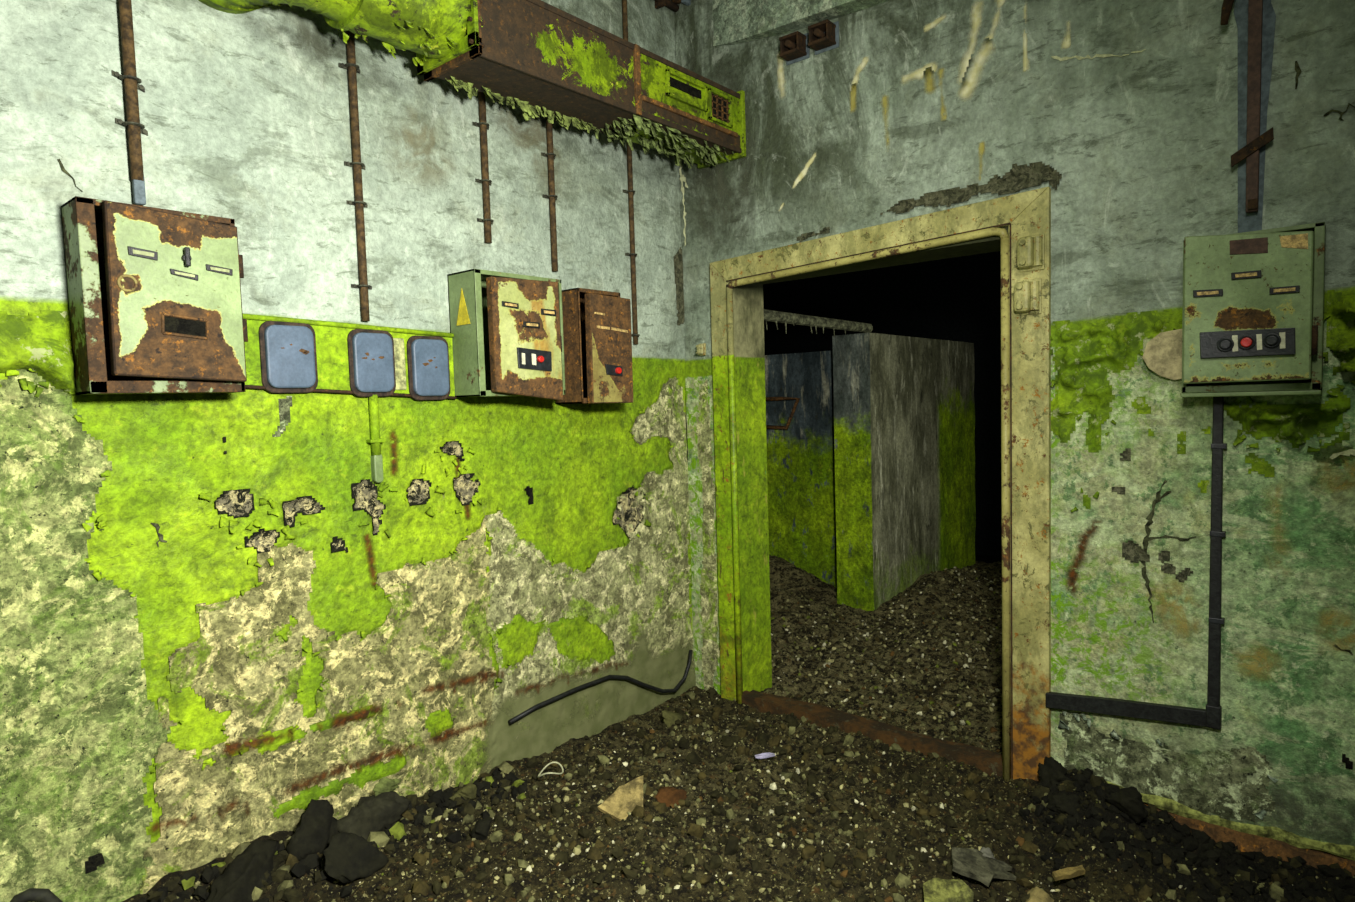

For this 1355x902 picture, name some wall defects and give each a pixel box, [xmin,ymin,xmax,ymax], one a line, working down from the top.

flaking render [880,161,1062,215]
rust [1068,521,1099,592]
crack [1140,480,1196,623]
peeling [0,368,720,902]
rust [423,671,503,692]
rust [224,734,293,753]
rust [321,705,380,729]
rust [430,721,491,742]
rust [287,745,414,793]